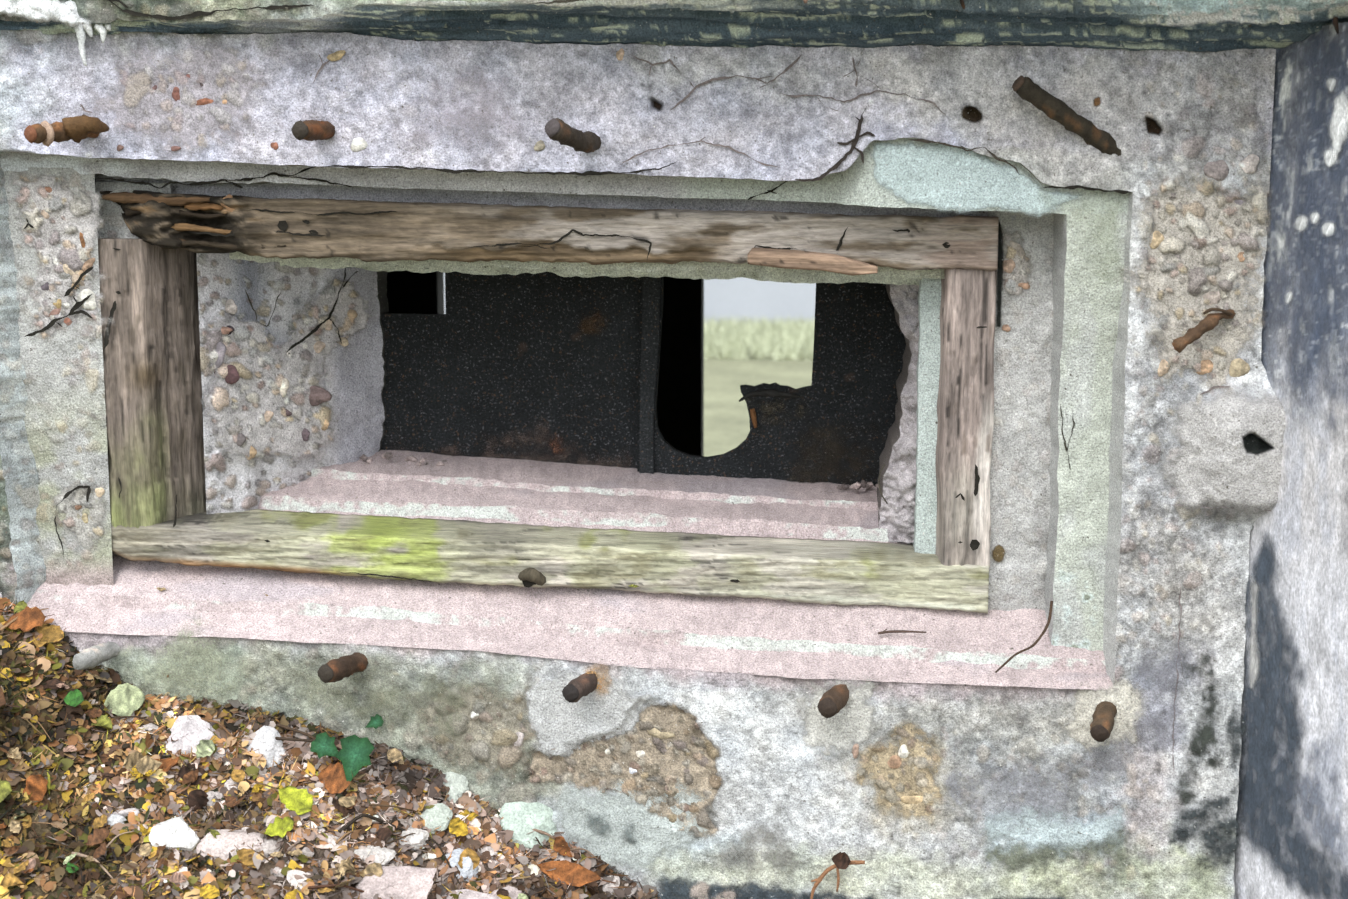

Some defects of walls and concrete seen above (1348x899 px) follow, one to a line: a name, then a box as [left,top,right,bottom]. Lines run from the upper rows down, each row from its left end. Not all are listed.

water stain [0,0,111,66]
rust [62,114,109,143]
crack [93,53,1130,200]
spalling [417,685,722,838]
water stain [1140,537,1348,899]